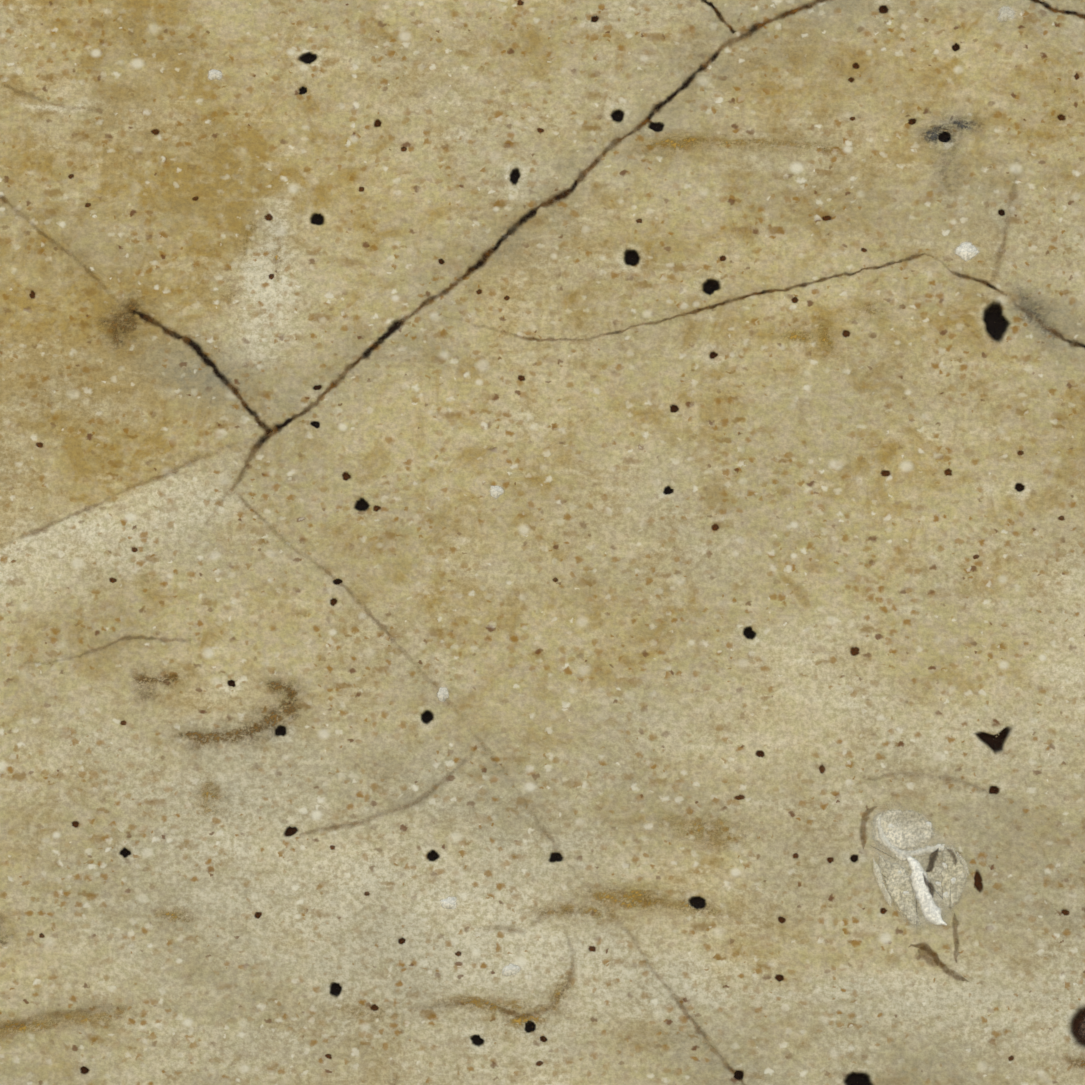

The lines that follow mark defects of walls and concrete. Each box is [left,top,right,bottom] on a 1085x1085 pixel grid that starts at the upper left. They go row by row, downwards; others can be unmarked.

crack [1031,0,1085,19]
crack [132,0,824,456]
crack [664,255,920,320]
crack [955,273,999,291]
crack [1052,330,1085,348]
spalling [873,811,966,925]